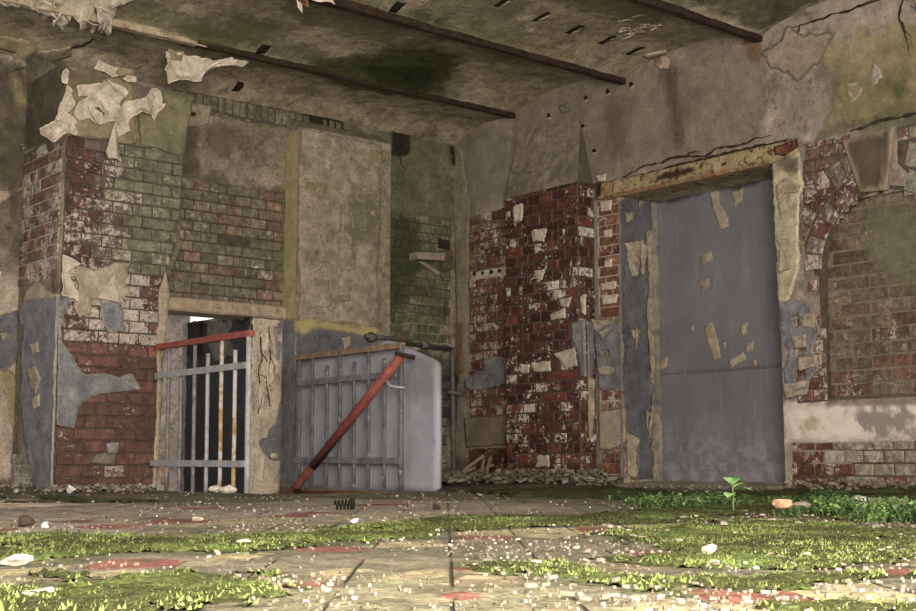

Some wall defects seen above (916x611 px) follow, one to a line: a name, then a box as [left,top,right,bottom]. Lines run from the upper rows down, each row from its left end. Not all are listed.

peeling [0,0,133,36]
crack [791,0,913,56]
peeling [0,34,249,161]
spalling [0,187,24,204]
peeling [512,203,523,222]
crack [622,135,771,178]
corrosion [594,138,799,200]
spalling [454,145,506,391]
spalling [772,152,821,398]
peeling [0,255,141,491]
crack [251,318,275,414]
peeling [520,181,759,481]